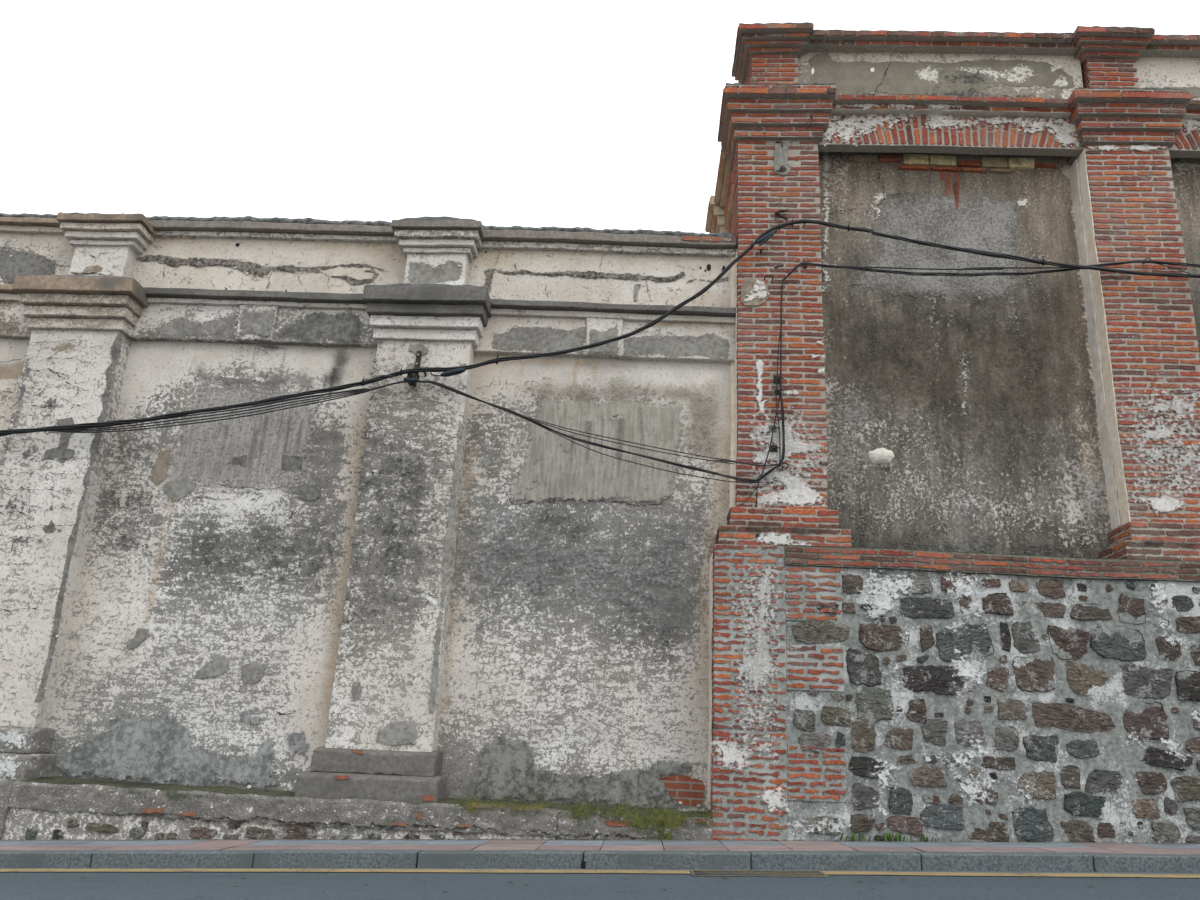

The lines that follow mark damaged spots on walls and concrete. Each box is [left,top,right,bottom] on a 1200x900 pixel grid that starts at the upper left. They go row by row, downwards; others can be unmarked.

peeling [805,53,1075,95]
flaking render [0,241,56,283]
crack [0,339,112,565]
peeling [0,331,122,702]
water stain [91,339,870,667]
water stain [710,531,812,775]
water stain [755,787,852,841]